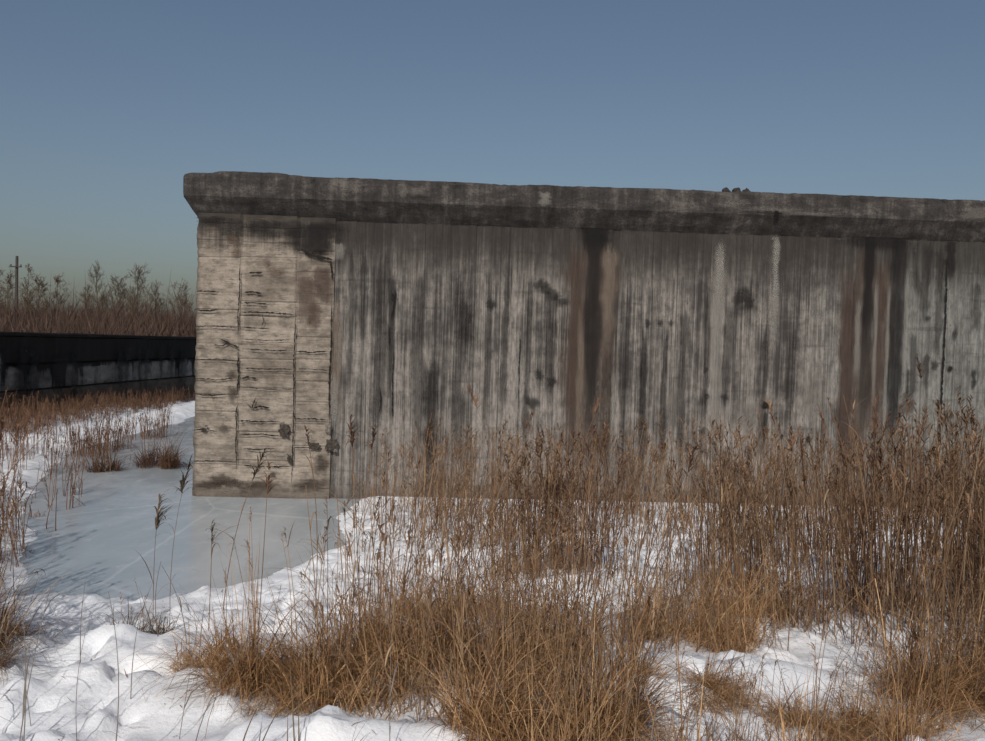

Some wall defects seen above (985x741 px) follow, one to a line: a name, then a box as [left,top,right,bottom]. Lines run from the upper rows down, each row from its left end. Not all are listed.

crack [193,249,333,483]
damp [250,219,280,237]
damp [288,221,340,254]
damp [388,278,396,409]
damp [424,362,438,462]
damp [535,279,568,305]
corrosion [566,228,615,454]
damp [639,320,673,462]
corrosion [851,260,892,443]
damp [852,237,906,428]